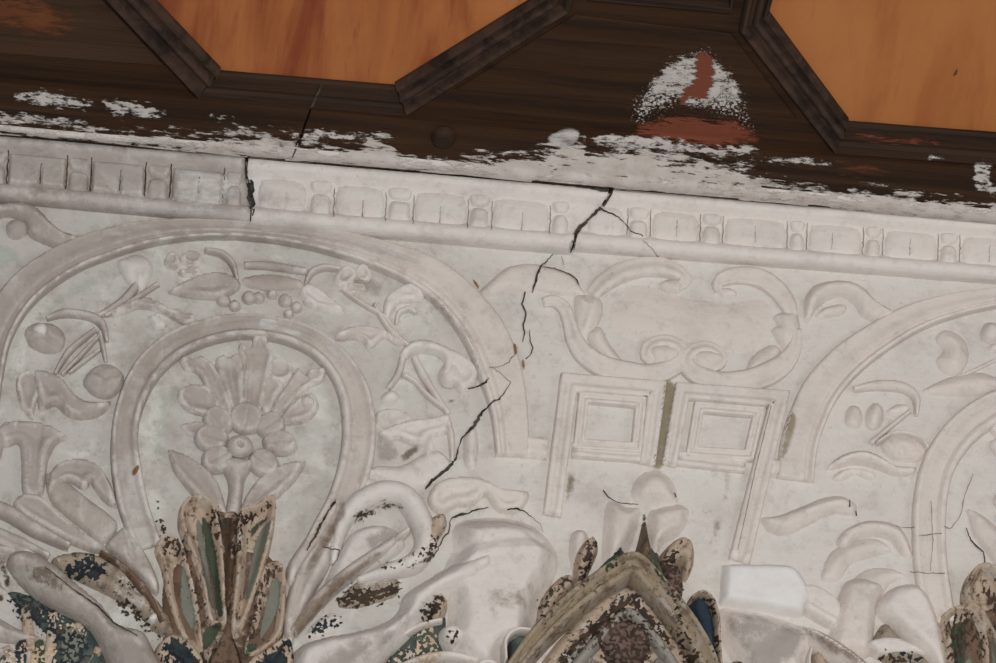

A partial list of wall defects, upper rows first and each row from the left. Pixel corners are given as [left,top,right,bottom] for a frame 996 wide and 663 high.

crack [238,154,255,216]
crack [292,83,659,489]
peeling [0,566,91,663]
peeling [64,553,110,581]
peeling [116,579,220,663]
peeling [155,501,208,627]
peeling [206,501,276,615]
peeling [308,582,403,639]
peeling [386,595,459,663]
peeling [537,539,622,625]
peeling [558,540,717,663]
peeling [878,649,924,663]